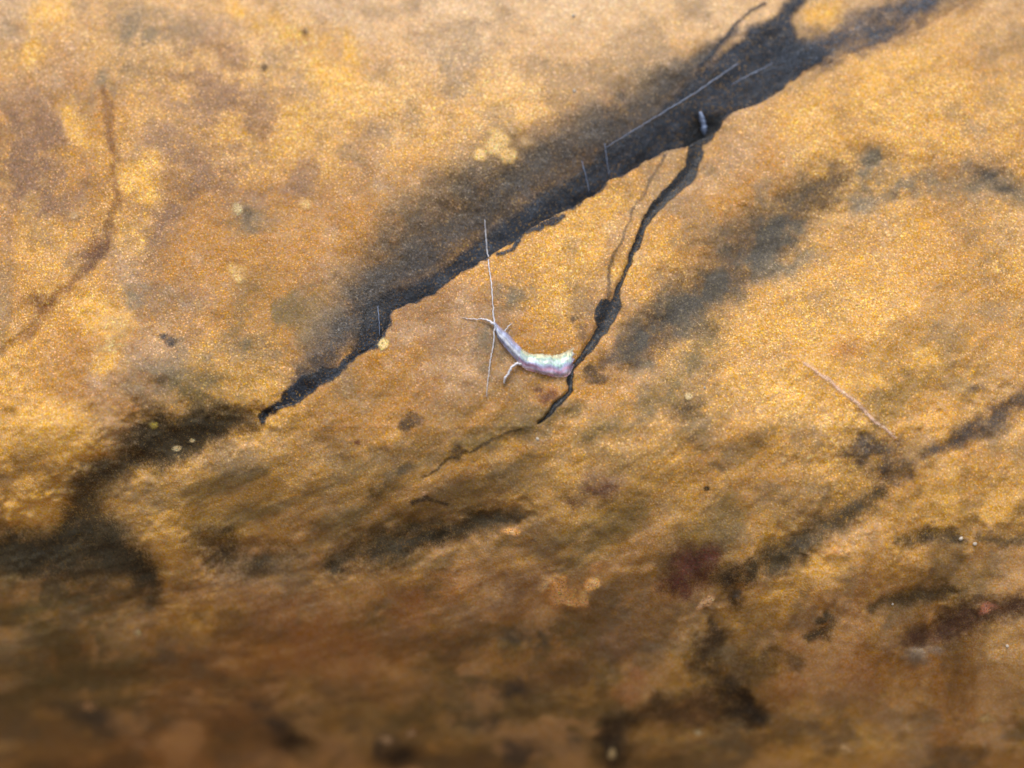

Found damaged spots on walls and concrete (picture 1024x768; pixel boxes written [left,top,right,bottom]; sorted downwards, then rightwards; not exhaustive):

crack [258,0,942,506]
damp [586,174,848,383]
damp [0,408,257,604]